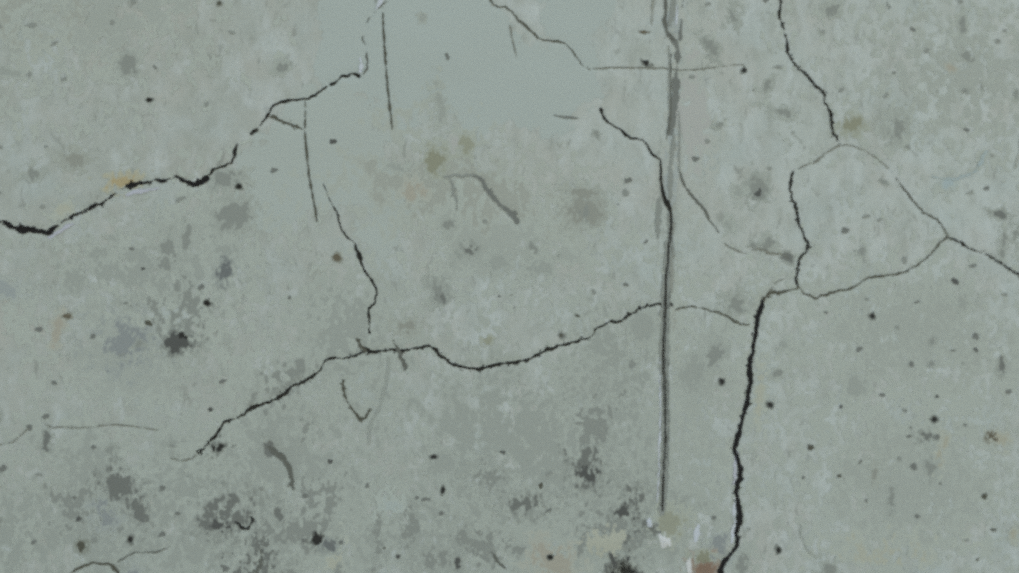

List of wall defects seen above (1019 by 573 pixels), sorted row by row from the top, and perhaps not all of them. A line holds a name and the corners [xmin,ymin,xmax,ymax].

crack [490,0,744,71]
crack [0,1,387,236]
crack [599,107,660,159]
crack [443,174,520,224]
crack [323,184,378,334]
crack [670,0,1019,573]
crack [170,302,662,461]
crack [0,424,158,445]
crack [268,446,296,490]
crack [72,548,167,573]
crack [234,516,265,573]